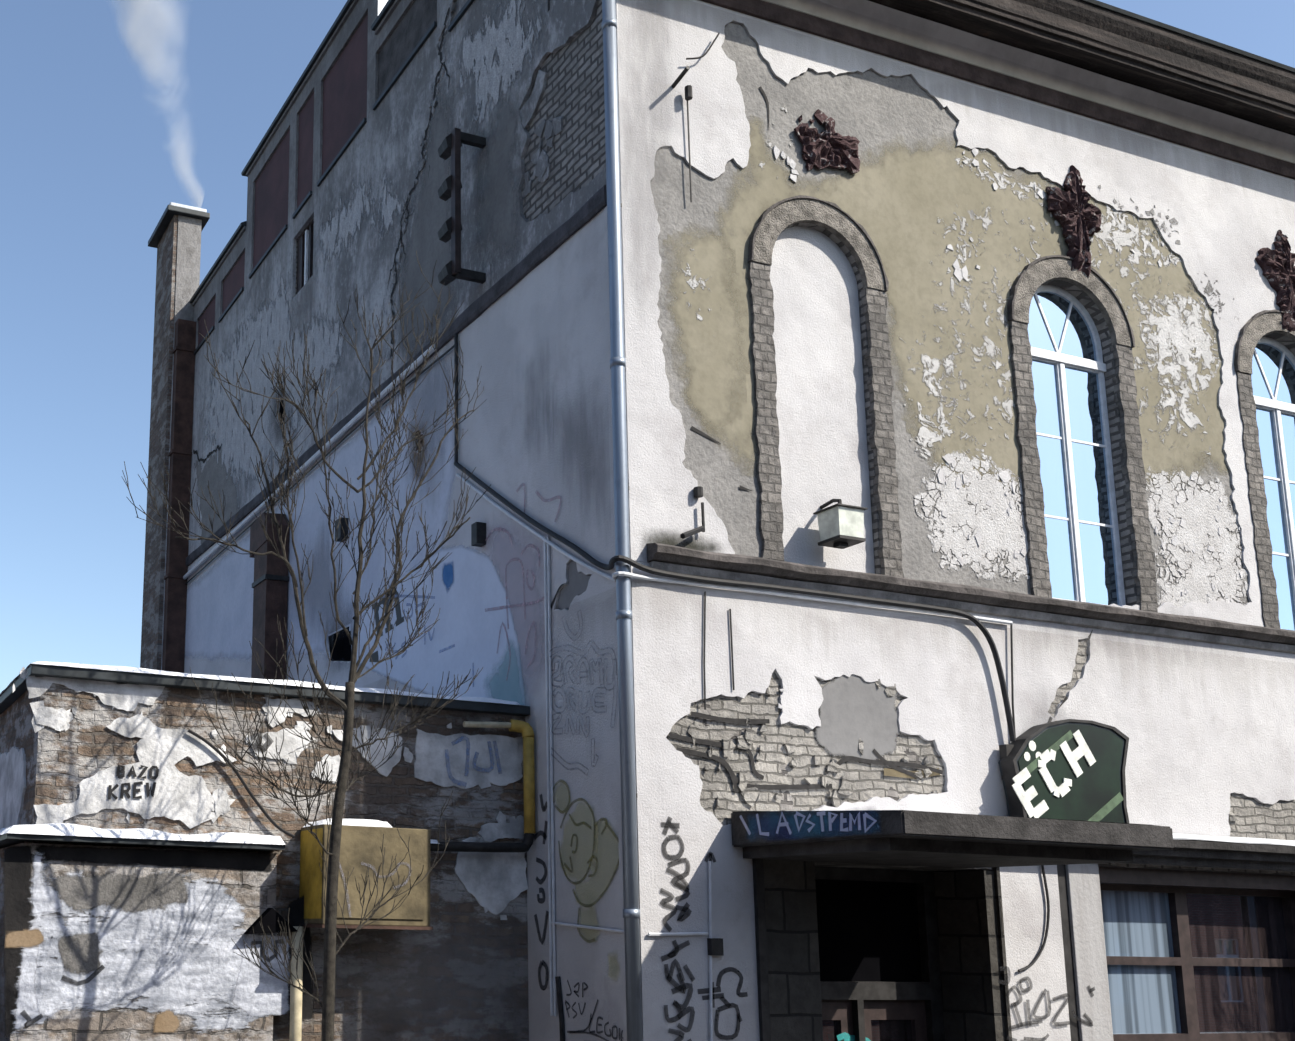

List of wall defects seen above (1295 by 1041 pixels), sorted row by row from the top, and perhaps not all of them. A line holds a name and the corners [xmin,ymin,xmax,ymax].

crack [385,2,454,361]
flaking render [650,22,1069,595]
crack [193,444,222,463]
flaking render [1088,185,1250,607]
spalling [328,627,352,661]
flaking render [0,667,237,830]
flaking render [245,695,523,789]
flaking render [454,811,528,920]
spalling [666,671,945,826]
spalling [1228,793,1295,840]